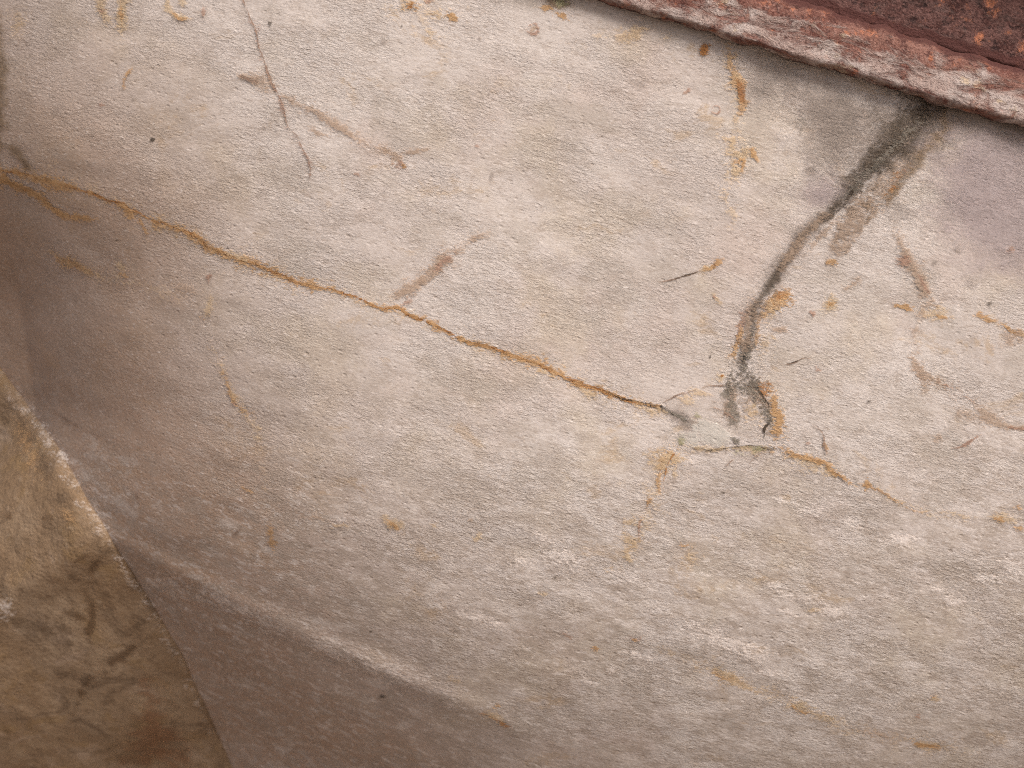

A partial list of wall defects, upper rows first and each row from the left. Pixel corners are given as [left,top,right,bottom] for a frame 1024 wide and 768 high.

rust [725,51,749,115]
leakage [805,92,1024,269]
leakage [896,237,932,297]
crack [0,121,922,512]
leakage [913,362,945,391]